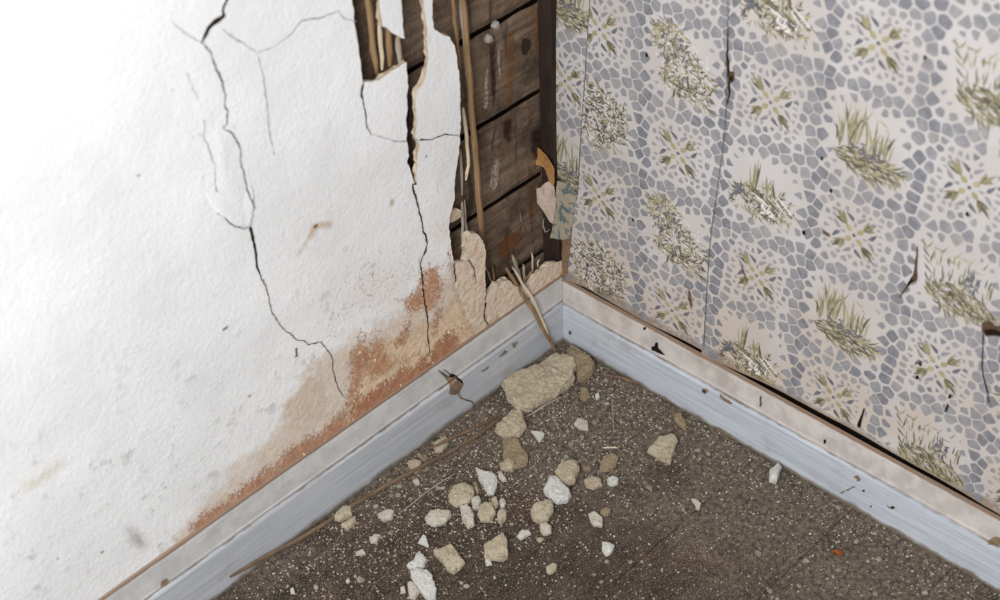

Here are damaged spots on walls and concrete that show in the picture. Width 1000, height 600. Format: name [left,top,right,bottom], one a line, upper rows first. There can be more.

crack [172,0,357,398]
damp [175,283,474,544]
flaking render [188,230,562,533]
spalling [361,0,449,183]
crack [360,83,458,142]
crack [412,183,430,355]